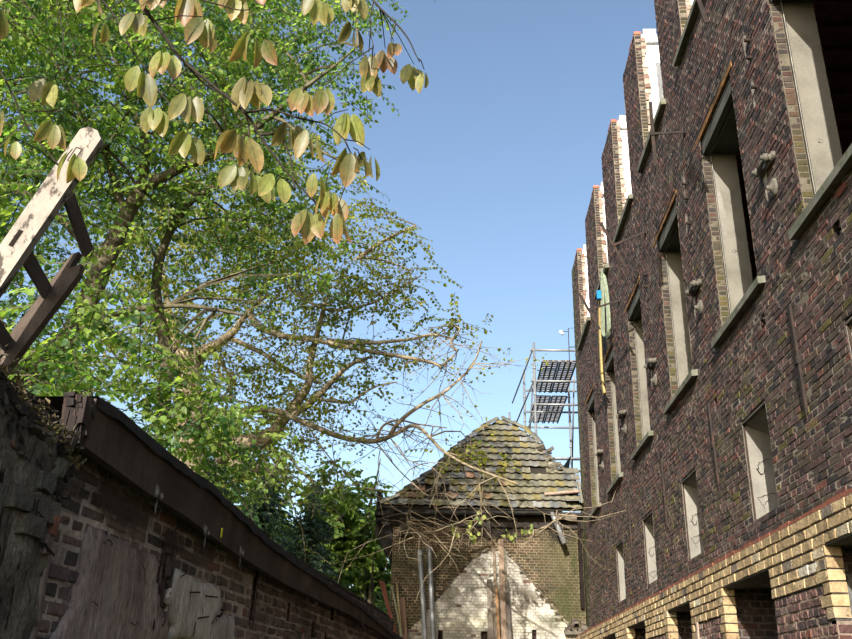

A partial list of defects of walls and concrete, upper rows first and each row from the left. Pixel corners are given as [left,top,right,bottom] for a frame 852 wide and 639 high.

flaking render [0,371,76,556]
spalling [153,530,177,631]